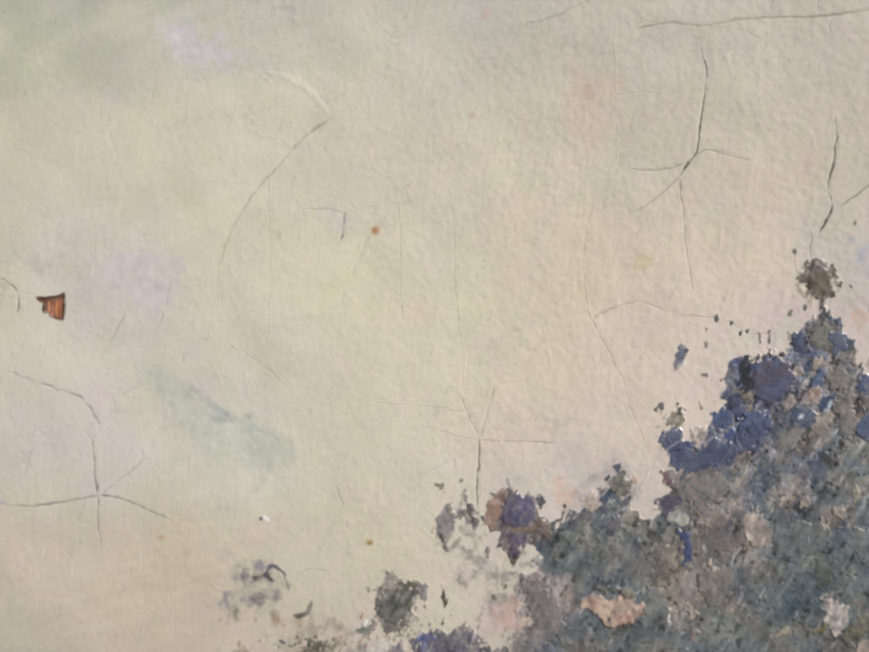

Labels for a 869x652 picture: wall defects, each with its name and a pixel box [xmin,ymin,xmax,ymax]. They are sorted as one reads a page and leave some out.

crack [628,0,869,290]
crack [583,202,782,441]
crack [0,361,199,549]
crack [418,383,554,509]
peeling [273,246,869,652]